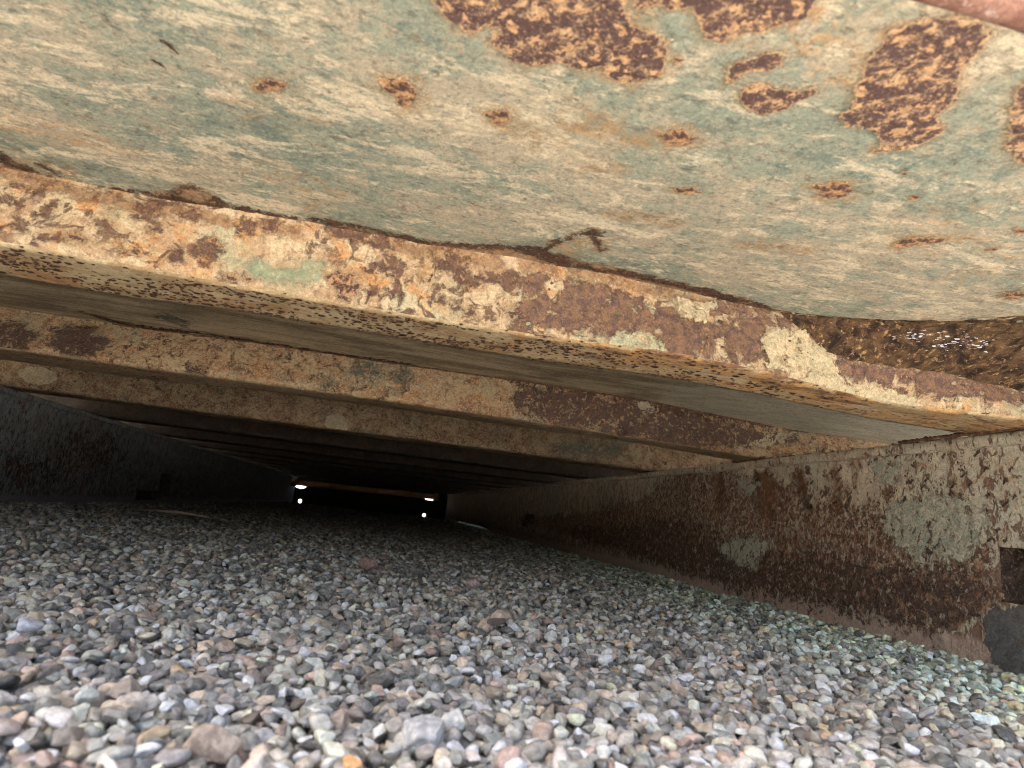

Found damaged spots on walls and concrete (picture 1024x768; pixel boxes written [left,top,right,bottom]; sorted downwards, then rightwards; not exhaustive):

corrosion [429,0,820,87]
corrosion [377,74,426,112]
corrosion [484,106,516,129]
corrosion [722,50,819,116]
corrosion [839,14,996,154]
corrosion [0,167,300,239]
crack [0,151,775,312]
corrosion [806,180,854,203]
corrosion [890,235,965,249]
corrosion [0,226,848,408]
corrosion [832,354,1024,407]
corrosion [500,384,1016,649]